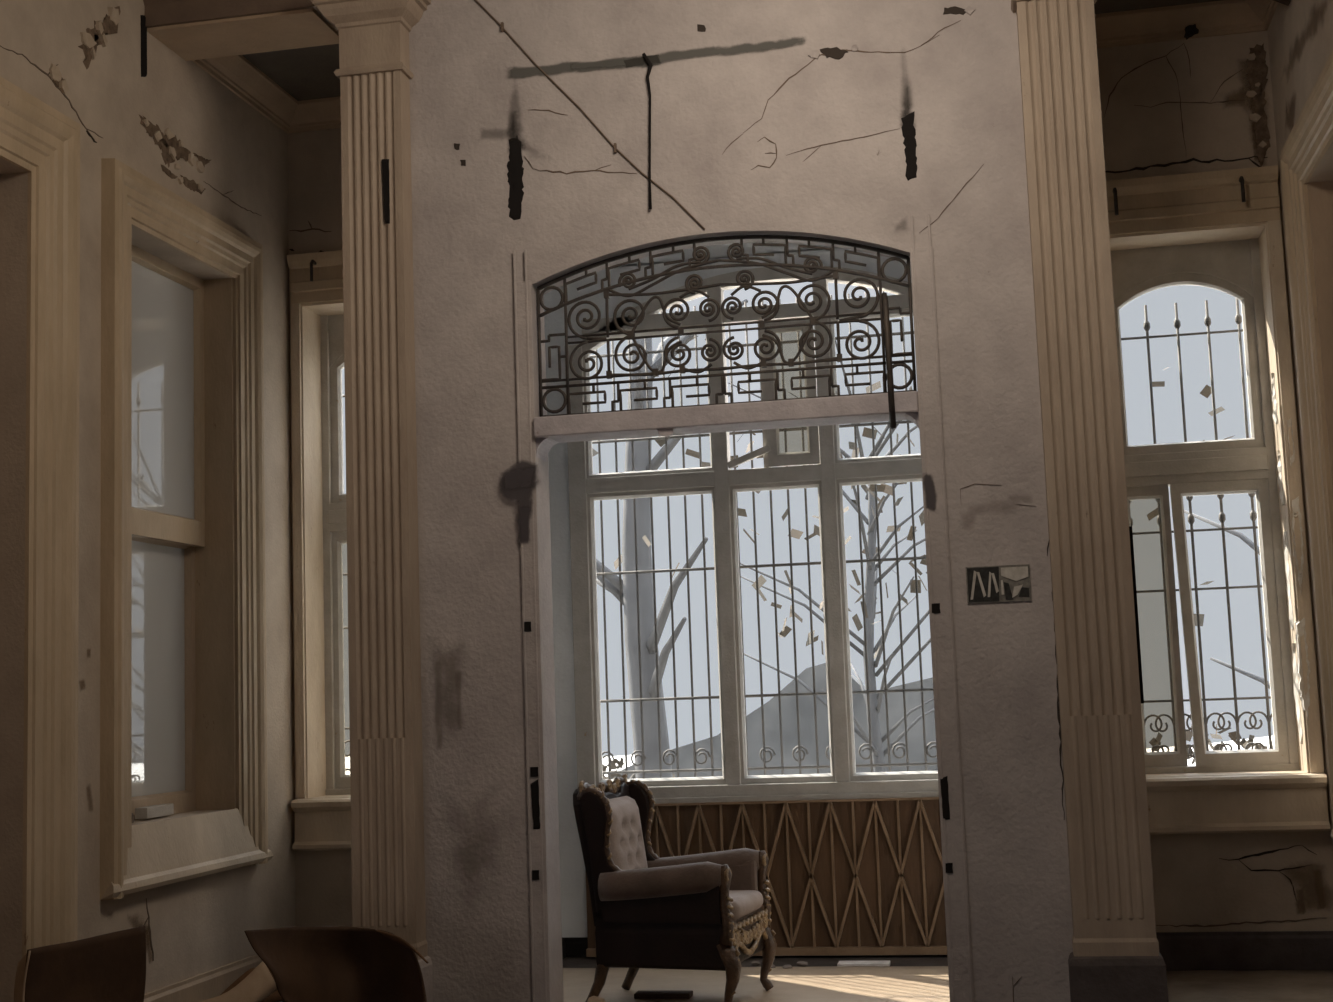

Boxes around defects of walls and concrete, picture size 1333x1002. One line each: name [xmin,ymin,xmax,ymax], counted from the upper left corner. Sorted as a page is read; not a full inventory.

flaking render [78,6,121,69]
crack [0,46,103,143]
crack [723,20,961,170]
crack [1104,43,1268,173]
flaking render [1245,43,1271,167]
flaking render [139,115,211,194]
crack [524,156,637,174]
crack [922,164,984,231]
crack [1156,845,1317,927]